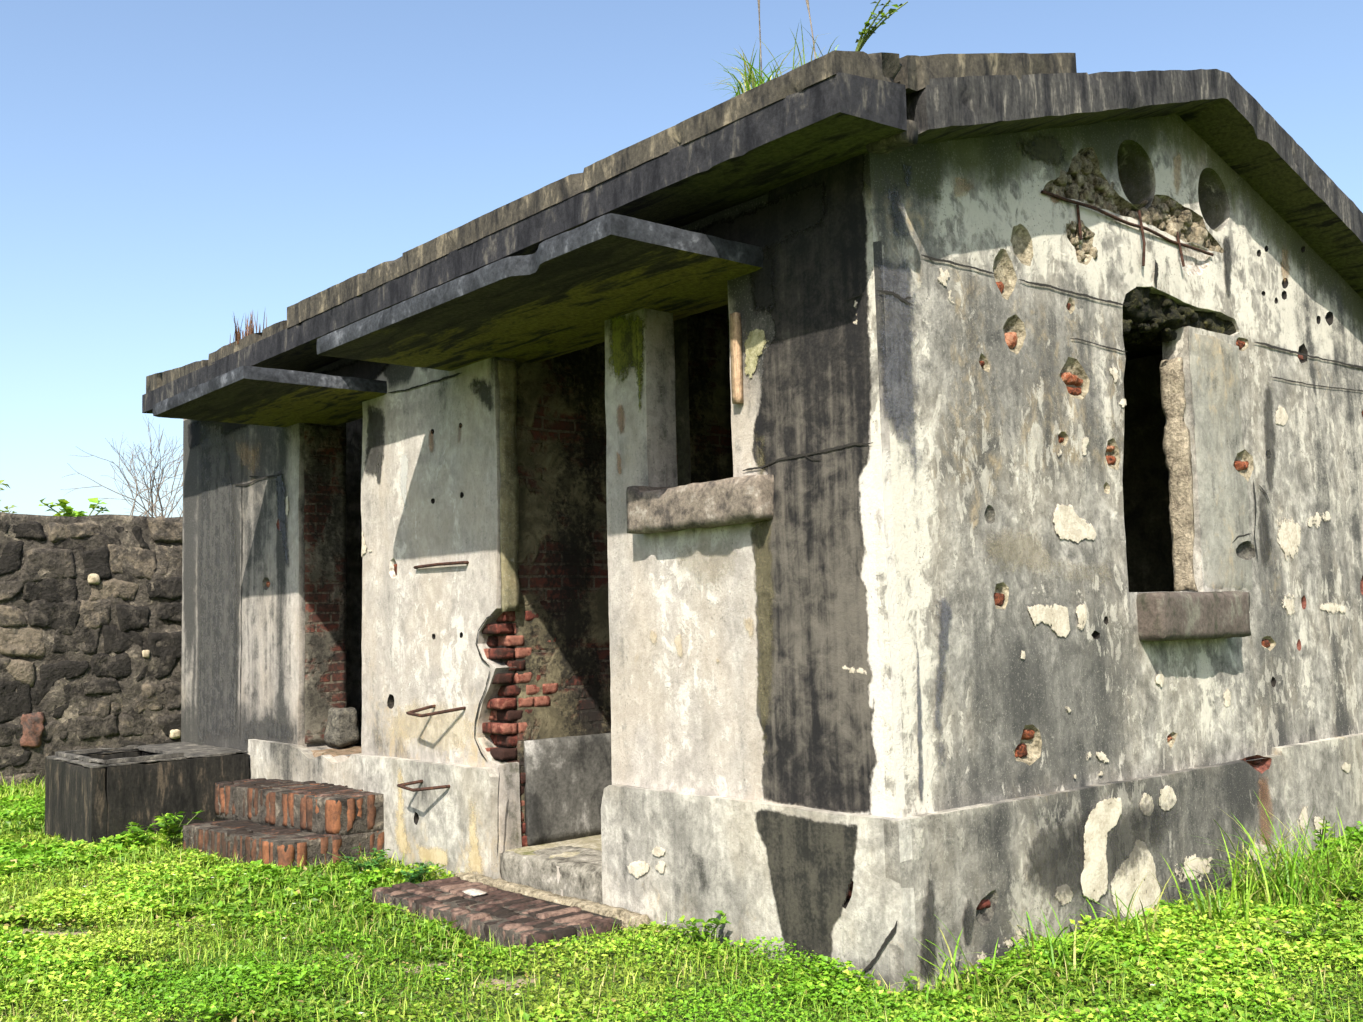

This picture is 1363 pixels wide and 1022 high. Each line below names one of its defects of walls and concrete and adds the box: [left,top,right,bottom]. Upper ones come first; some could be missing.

spalling [1041,147,1224,276]
leakage [319,360,388,380]
leakage [609,315,646,410]
peeling [1053,503,1097,543]
leakage [188,421,293,742]
leakage [692,154,917,973]
spalling [993,582,1009,609]
peeling [1027,604,1108,639]
peeling [1140,785,1177,815]
peeling [1055,797,1161,919]
peeling [1174,854,1212,883]
crack [858,921,897,982]